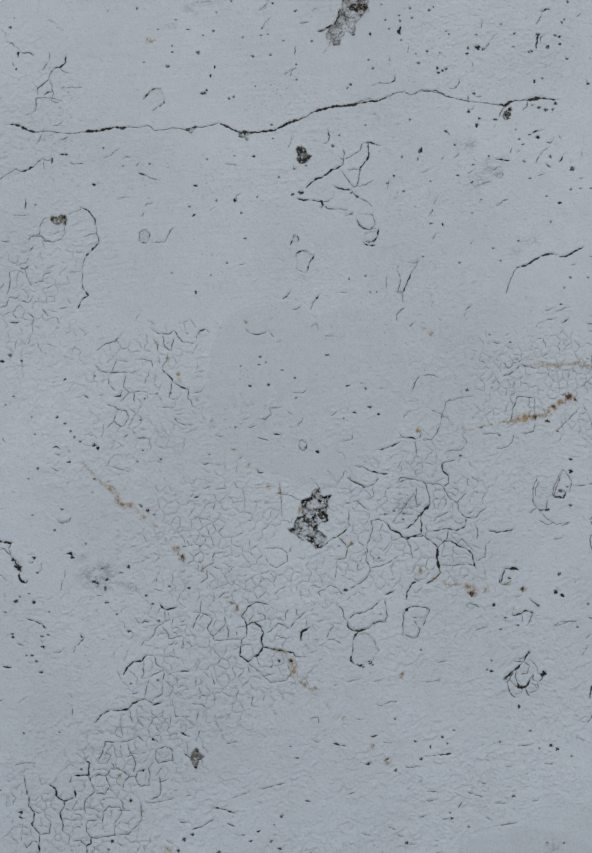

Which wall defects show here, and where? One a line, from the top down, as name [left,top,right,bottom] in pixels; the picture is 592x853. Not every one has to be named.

spalling [318,0,369,52]
crack [2,24,555,178]
spalling [293,146,312,167]
crack [291,132,392,230]
crack [506,247,592,293]
crack [0,200,207,472]
corrosion [503,394,577,422]
spalling [289,488,331,549]
crack [0,308,592,853]
spalling [191,748,204,769]